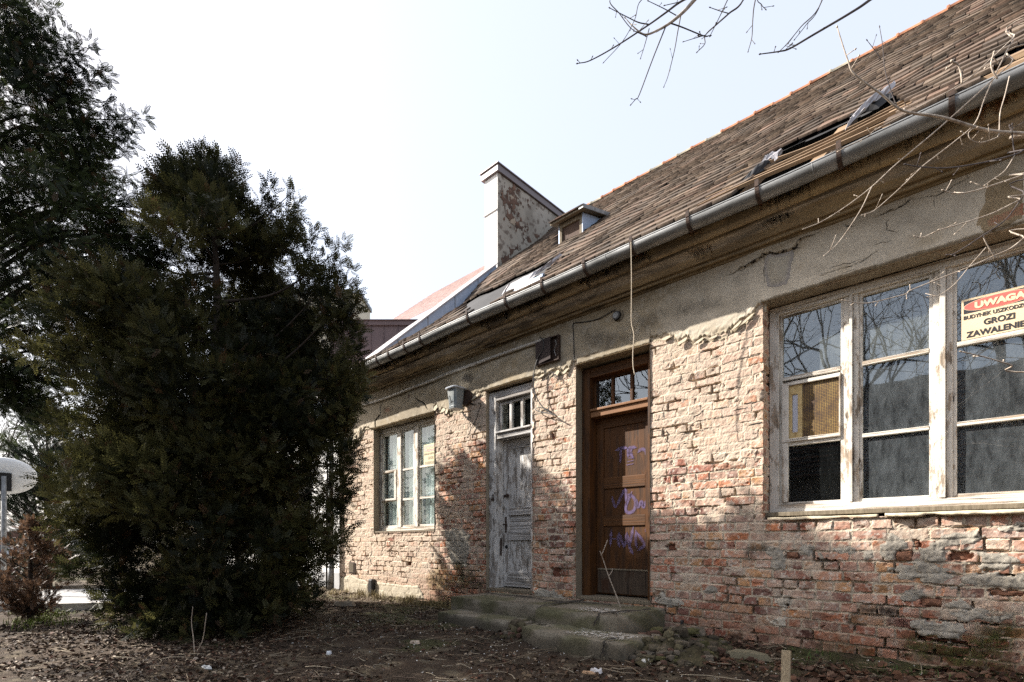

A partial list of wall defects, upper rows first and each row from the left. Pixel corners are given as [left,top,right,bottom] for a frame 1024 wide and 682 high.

spalling [500,184,540,264]
crack [731,231,820,281]
flaking render [650,300,767,347]
flaking render [532,348,609,381]
flaking render [433,390,485,417]
spalling [896,541,919,561]
spalling [951,552,972,560]
spalling [922,598,942,606]